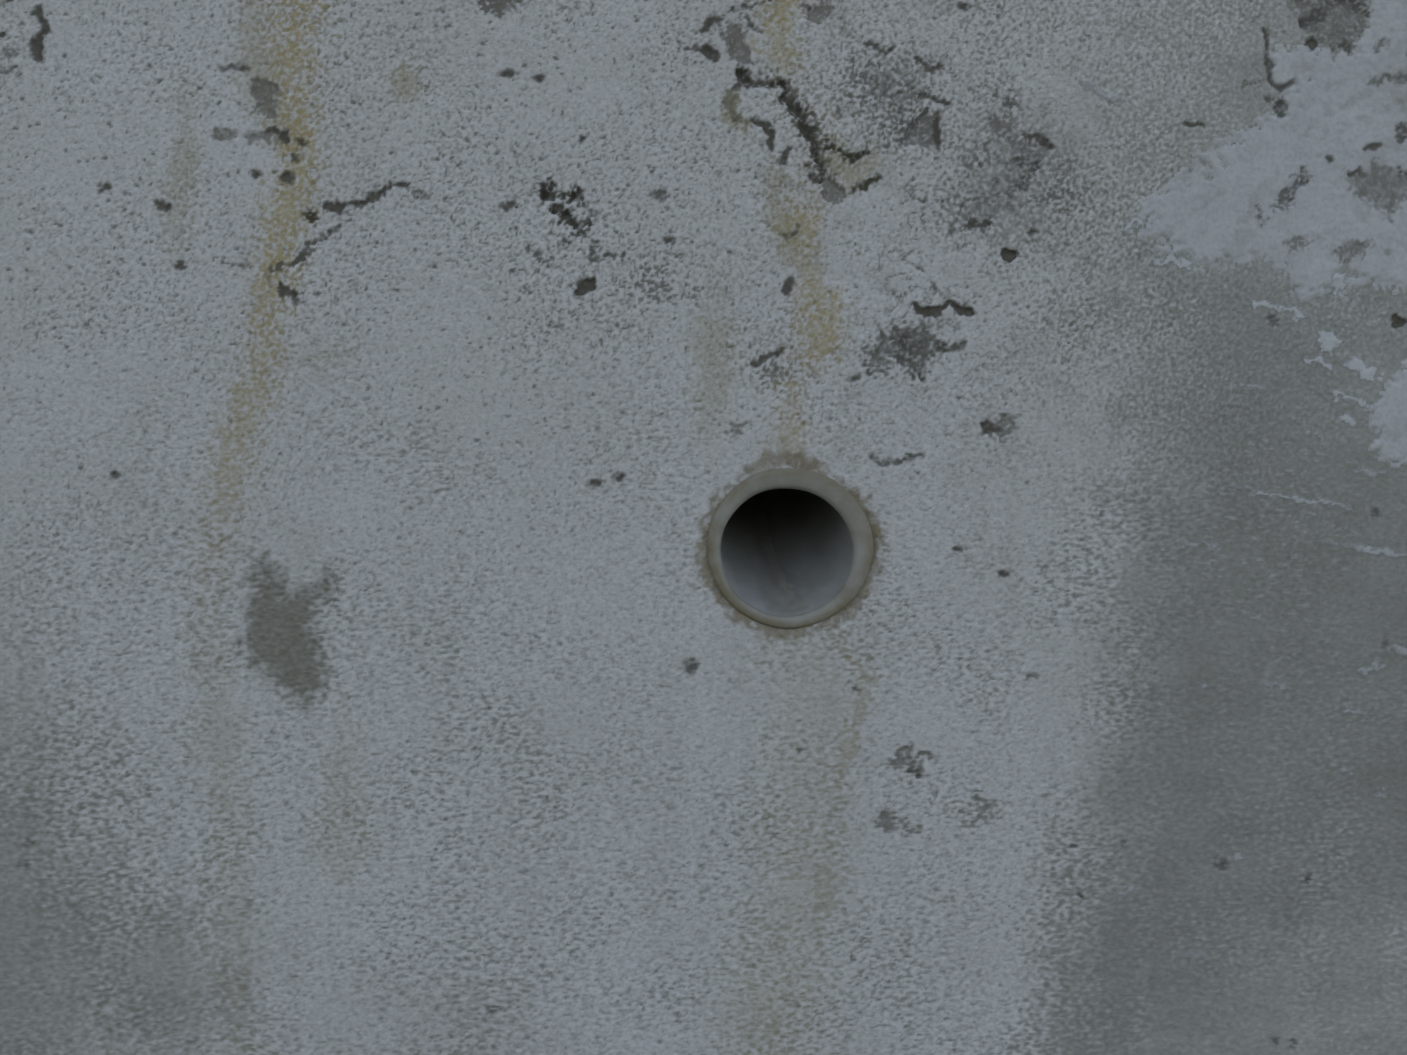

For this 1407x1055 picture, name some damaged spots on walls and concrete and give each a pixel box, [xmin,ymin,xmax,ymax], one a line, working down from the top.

corrosion [253,0,315,297]
crack [733,68,881,203]
crack [240,182,426,302]
damp [249,569,328,694]